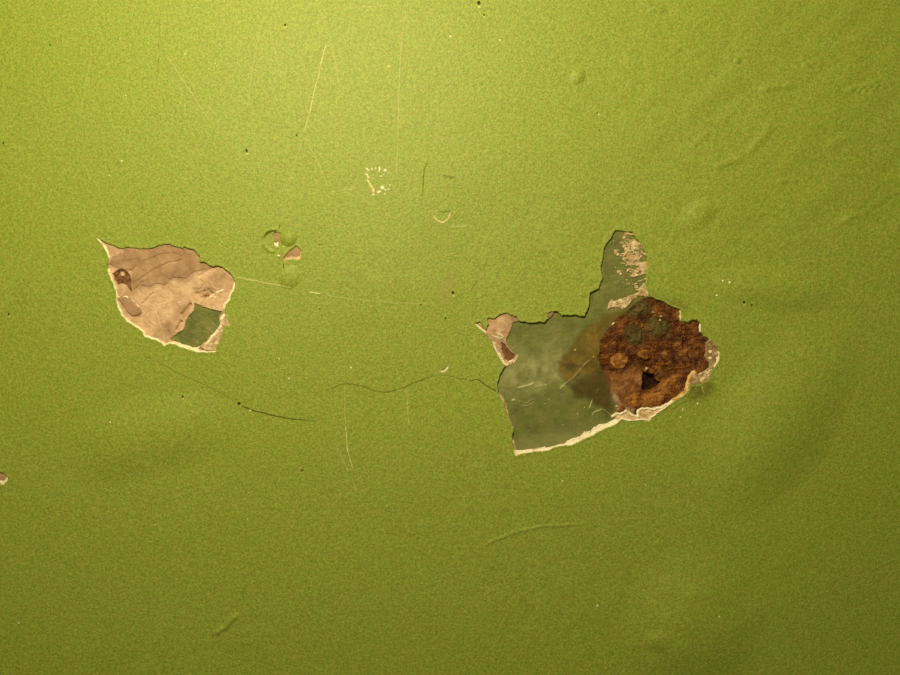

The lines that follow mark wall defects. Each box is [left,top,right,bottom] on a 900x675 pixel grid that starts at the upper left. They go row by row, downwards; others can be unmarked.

peeling [97,238,235,352]
peeling [261,225,301,267]
peeling [476,230,720,456]
crack [237,402,301,420]